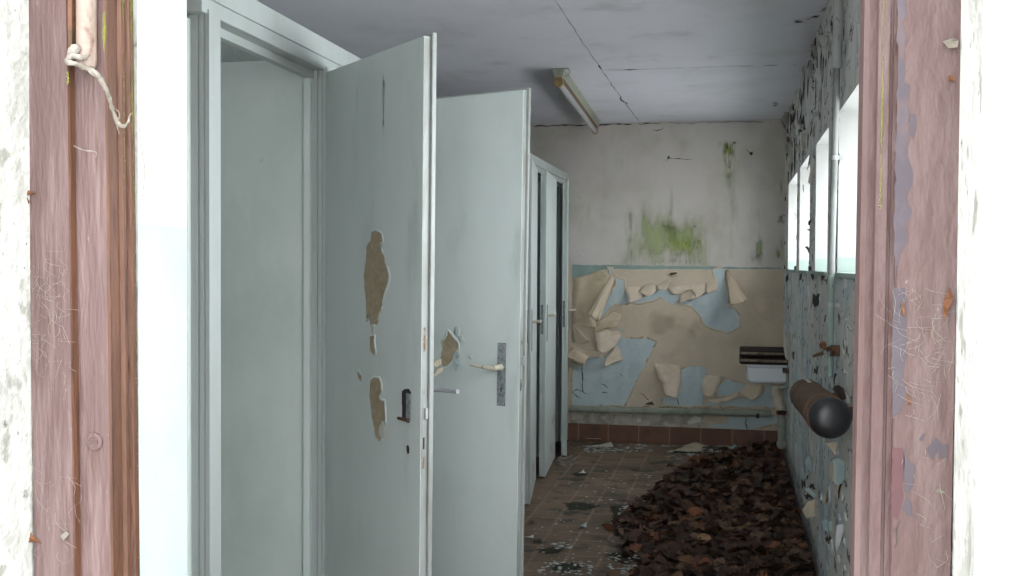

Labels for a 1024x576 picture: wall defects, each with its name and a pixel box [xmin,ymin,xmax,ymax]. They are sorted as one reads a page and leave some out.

crack [534,1,764,127]
peeling [782,6,860,283]
peeling [357,372,386,442]
peeling [364,231,388,354]
peeling [434,326,465,377]
peeling [568,266,780,430]
peeling [783,293,827,333]
peeling [809,348,854,404]
peeling [801,442,847,573]